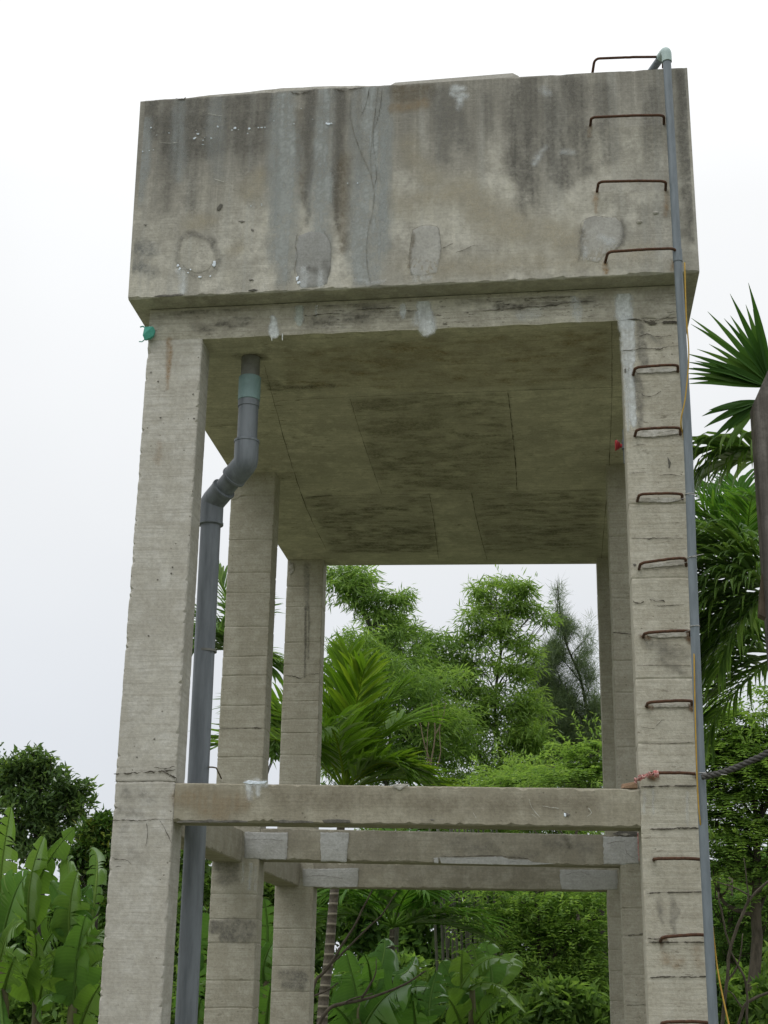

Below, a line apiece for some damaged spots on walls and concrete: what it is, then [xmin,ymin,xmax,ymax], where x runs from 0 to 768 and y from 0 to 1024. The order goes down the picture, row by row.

water stain [139,85,464,282]
crack [292,88,396,316]
water stain [356,301,457,375]
crack [115,766,177,782]